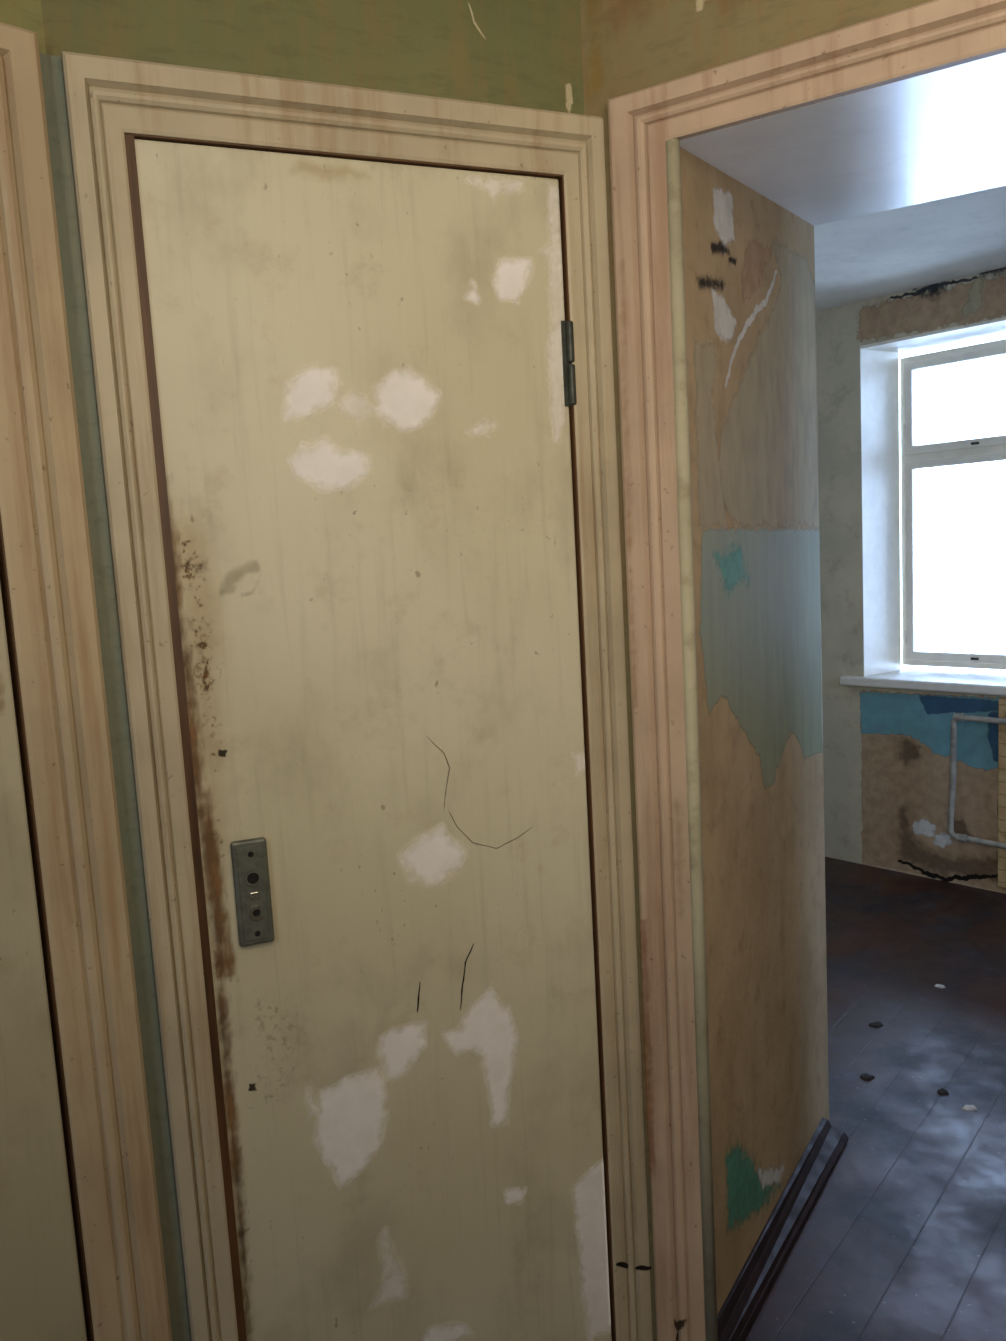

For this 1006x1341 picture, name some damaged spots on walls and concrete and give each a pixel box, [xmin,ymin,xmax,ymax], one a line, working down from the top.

peeling [495,259,530,299]
peeling [549,189,564,428]
flaking render [857,276,1006,341]
peeling [286,370,335,416]
peeling [292,442,366,488]
peeling [378,372,438,429]
peeling [693,188,823,789]
peeling [404,828,463,882]
flaking render [860,690,1006,893]
peeling [316,1026,425,1183]
peeling [446,991,515,1124]
peeling [575,1161,611,1338]